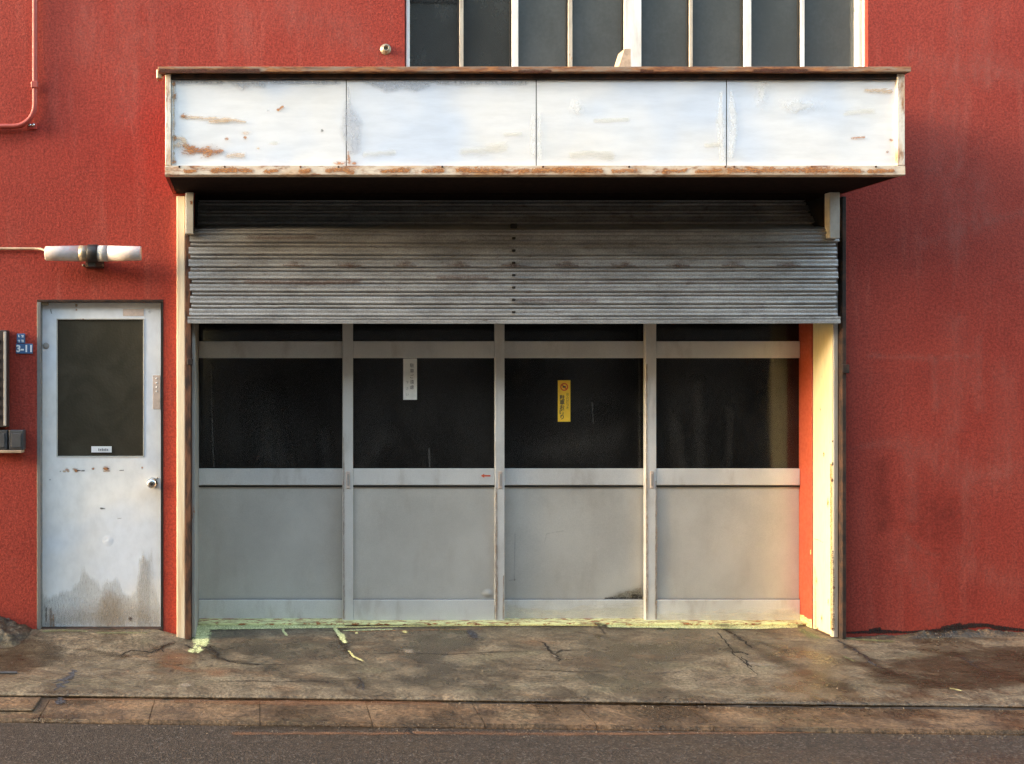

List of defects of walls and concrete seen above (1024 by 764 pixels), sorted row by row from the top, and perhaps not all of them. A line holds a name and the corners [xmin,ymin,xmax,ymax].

corrosion [159,68,278,174]
corrosion [325,155,356,174]
corrosion [662,166,895,174]
crack [116,642,329,682]
crack [336,631,492,690]
crack [520,640,613,672]
crack [717,629,758,675]